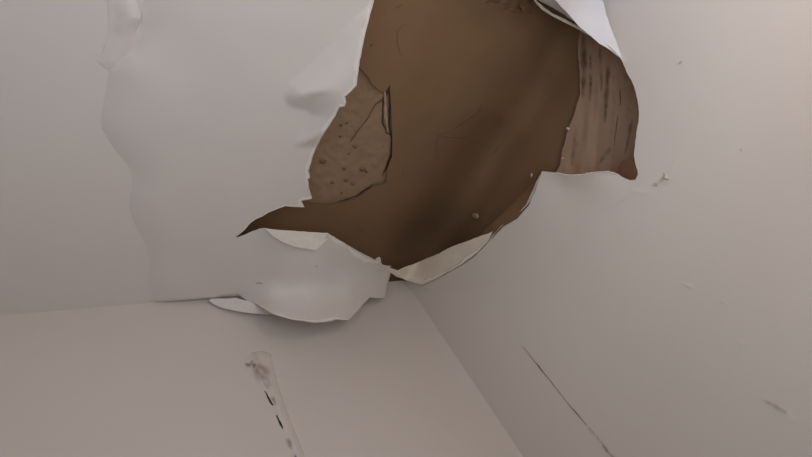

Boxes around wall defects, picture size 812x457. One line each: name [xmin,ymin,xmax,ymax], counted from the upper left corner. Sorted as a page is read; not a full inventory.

peeling [102,0,638,323]
crack [246,351,305,457]
crack [522,347,587,426]